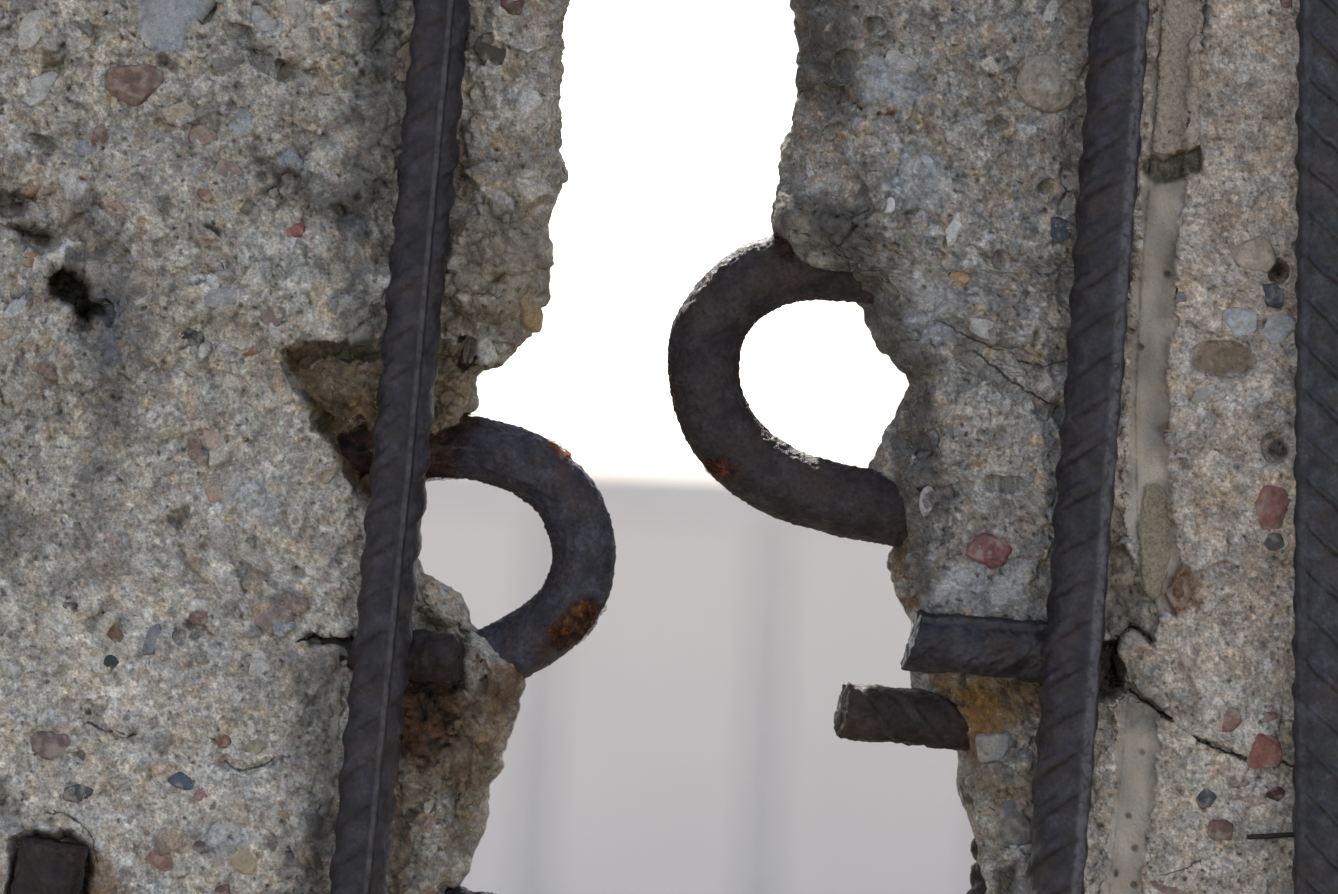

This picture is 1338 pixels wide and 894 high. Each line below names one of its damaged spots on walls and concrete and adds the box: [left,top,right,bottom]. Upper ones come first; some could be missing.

corrosion [774,232,800,261]
corrosion [291,358,378,499]
spalling [289,0,473,894]
corrosion [425,412,476,482]
corrosion [548,438,573,459]
corrosion [703,459,740,480]
spalling [833,0,1205,894]
corrosion [544,599,606,650]
corrosion [400,668,520,782]
crack [1111,626,1245,757]
spalling [8,831,91,894]
spalling [444,885,497,894]